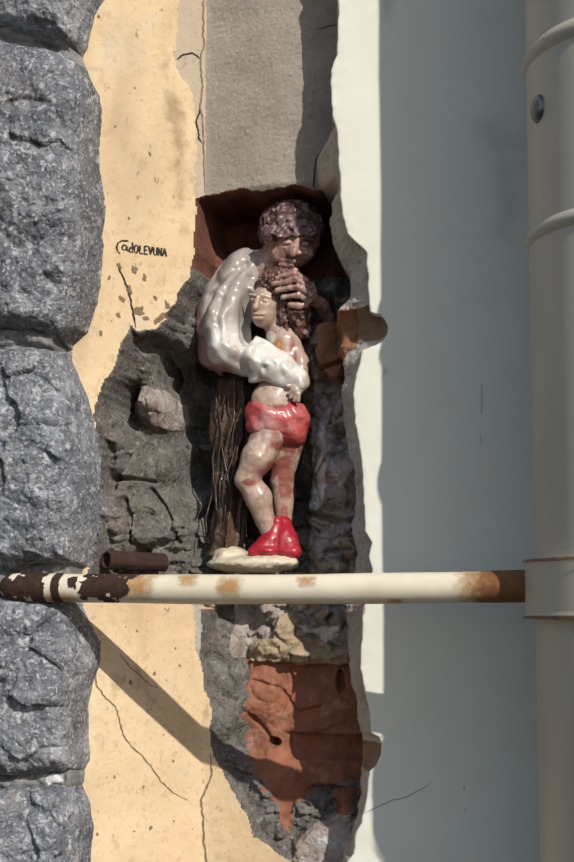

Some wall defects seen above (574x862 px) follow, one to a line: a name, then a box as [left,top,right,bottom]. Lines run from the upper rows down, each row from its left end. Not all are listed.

crack [177,0,205,188]
spalling [88,0,388,575]
rust [0,572,148,603]
rust [463,557,574,603]
crack [95,675,213,862]
spalling [194,604,382,862]
crack [366,782,431,813]